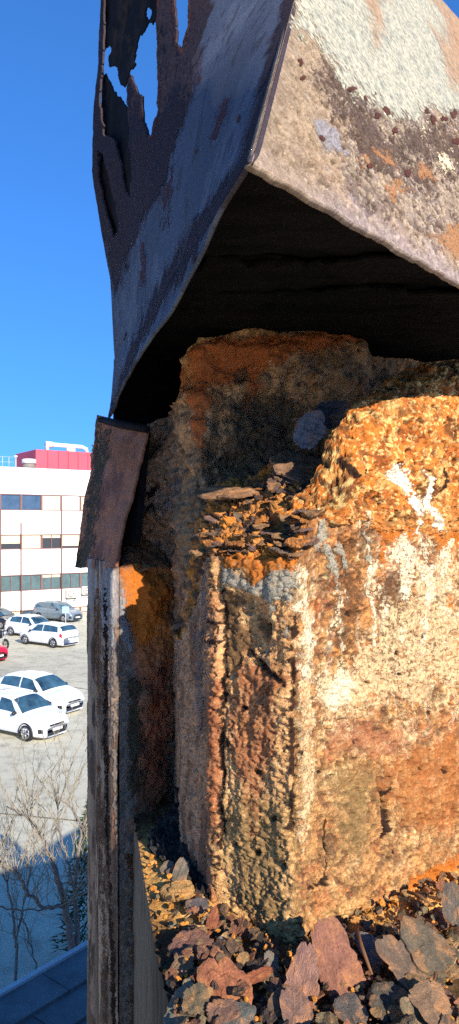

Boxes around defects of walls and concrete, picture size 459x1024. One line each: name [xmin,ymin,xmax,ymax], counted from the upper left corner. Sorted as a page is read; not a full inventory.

rust [298,45,459,203]
damp [101,562,117,666]
rust [120,561,170,647]
damp [221,464,459,855]